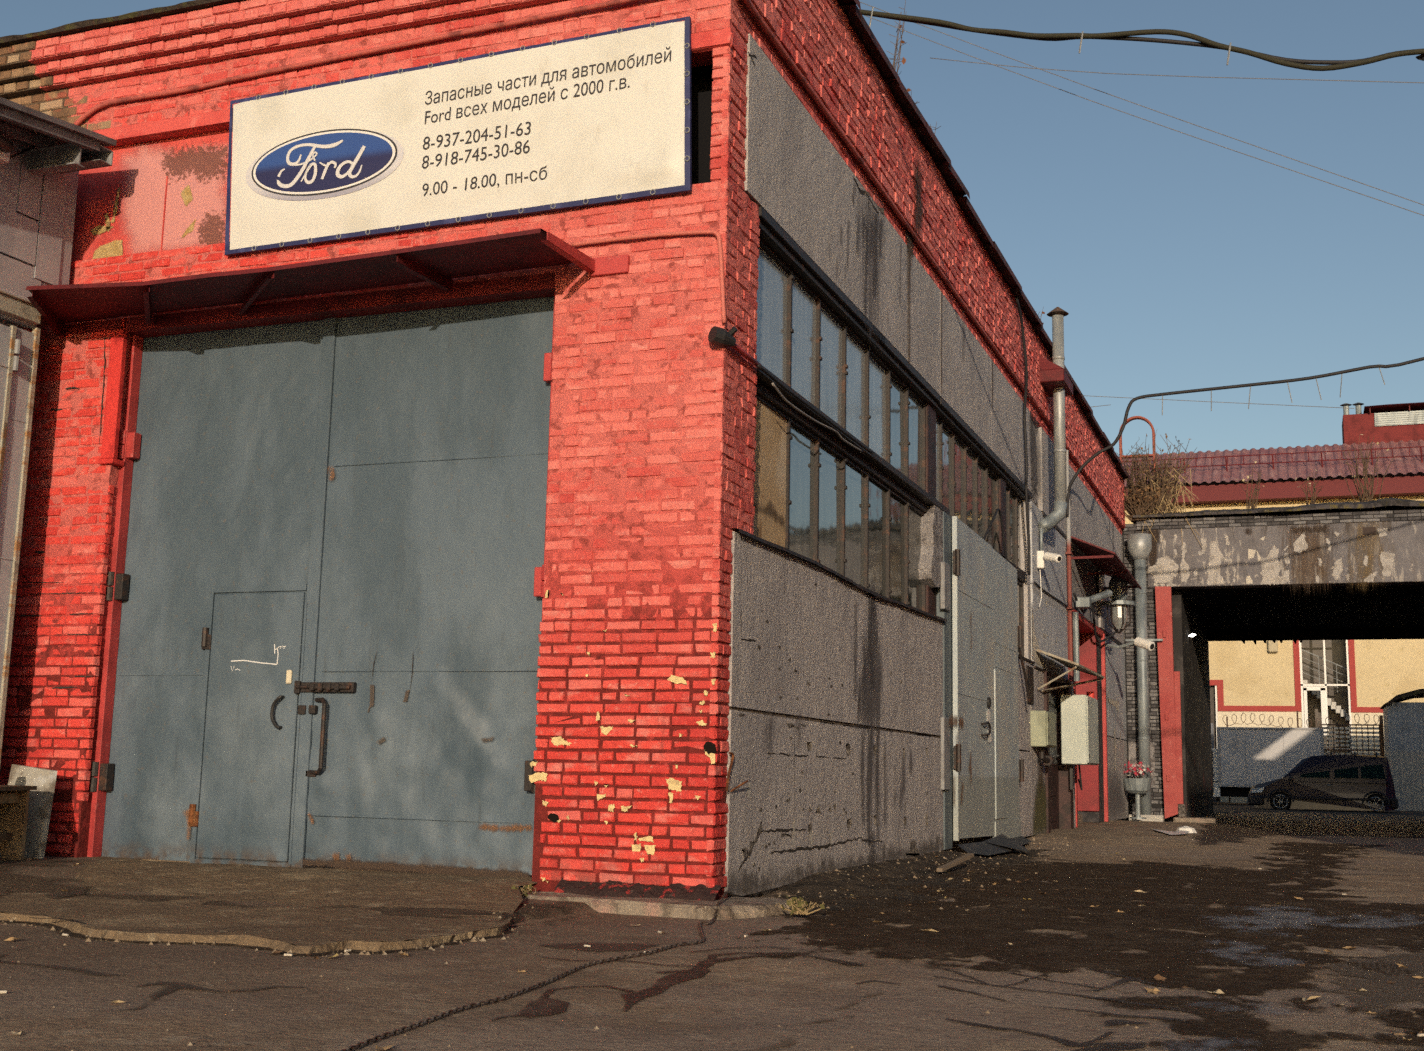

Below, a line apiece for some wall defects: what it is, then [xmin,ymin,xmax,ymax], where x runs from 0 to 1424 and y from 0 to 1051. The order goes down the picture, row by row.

peeling [91,188,123,259]
leakage [841,197,882,323]
peeling [1147,528,1395,587]
peeling [551,736,572,746]
peeling [596,712,635,735]
spalling [696,679,716,764]
leakage [730,584,943,897]
peeling [529,761,548,783]
peeling [594,781,631,825]
peeling [666,764,701,803]
crack [739,740,882,870]
peeling [632,832,656,862]